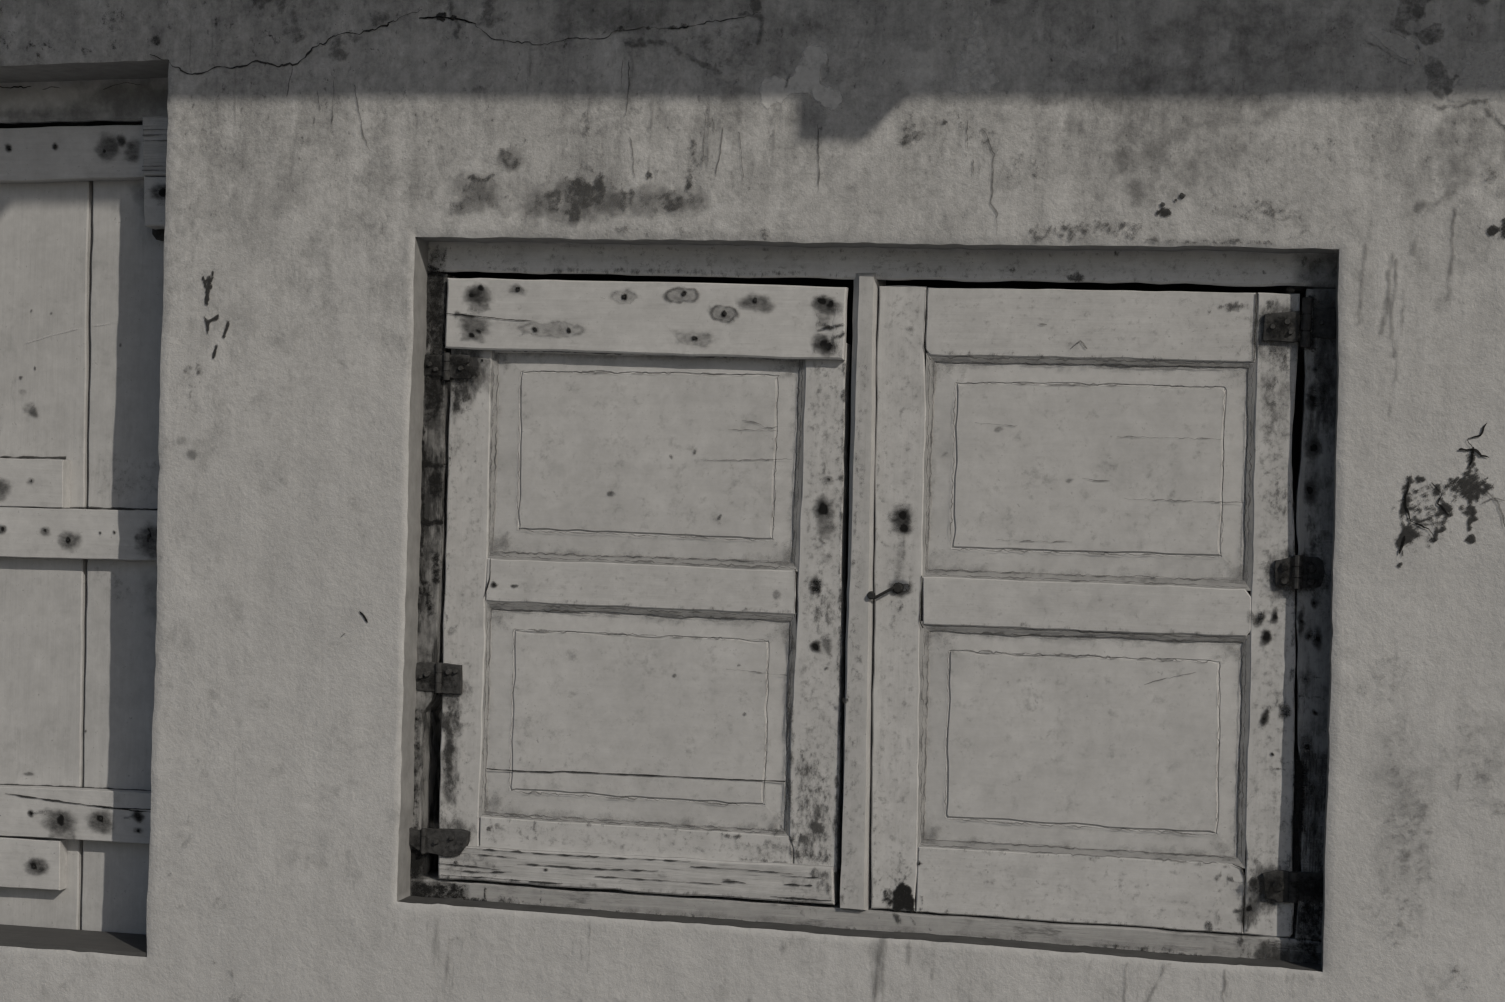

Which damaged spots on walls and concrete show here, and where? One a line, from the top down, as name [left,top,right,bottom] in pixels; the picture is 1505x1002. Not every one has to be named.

crack [150,9,761,75]
peeling [760,46,842,109]
water stain [537,140,695,221]
spalling [1393,423,1494,568]